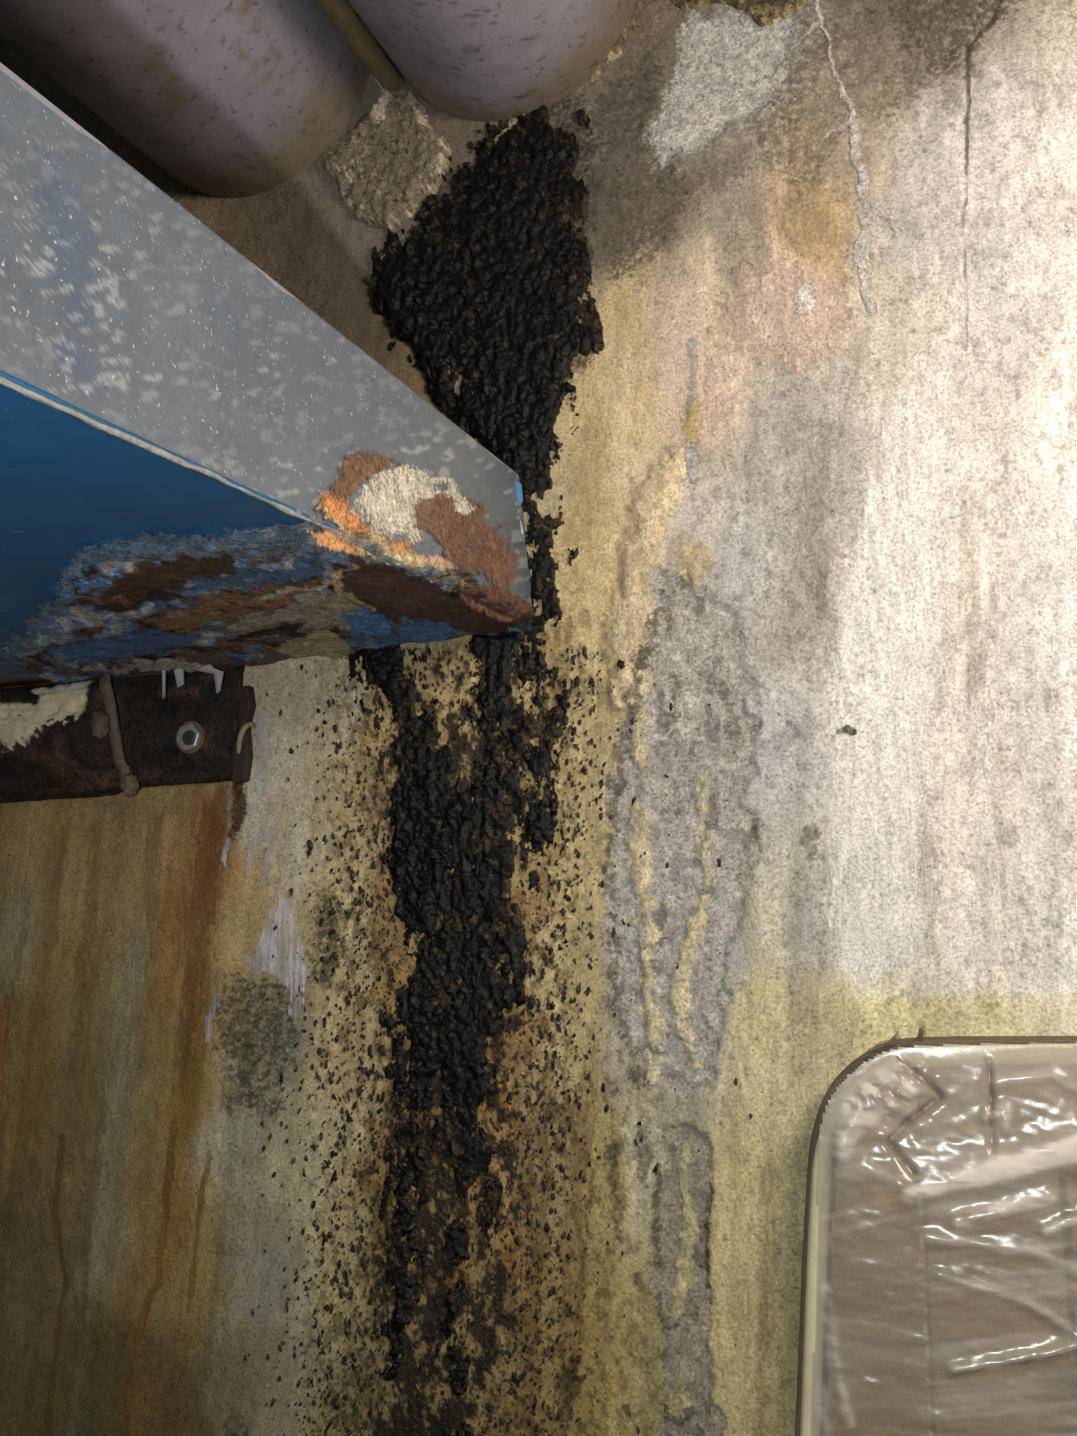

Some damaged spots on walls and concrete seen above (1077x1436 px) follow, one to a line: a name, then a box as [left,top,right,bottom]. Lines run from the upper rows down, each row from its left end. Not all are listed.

crack [963,0,1003,336]
corrosion [111,450,535,677]
damp [205,0,1018,1436]
corrosion [177,784,247,1102]
corrosion [124,1120,177,1436]
corrosion [188,1159,210,1298]